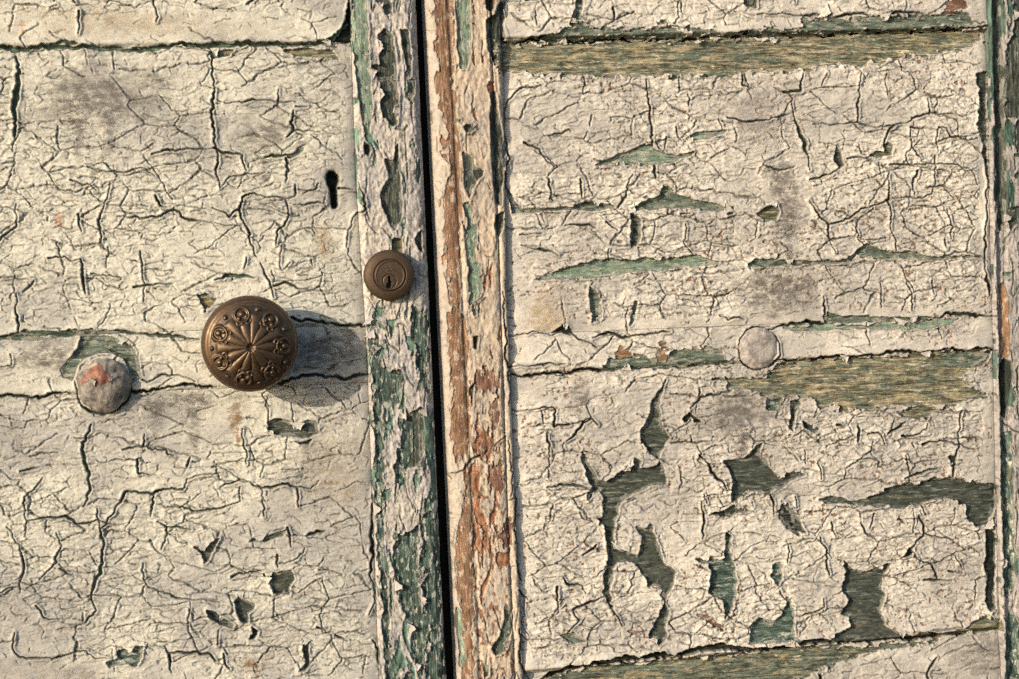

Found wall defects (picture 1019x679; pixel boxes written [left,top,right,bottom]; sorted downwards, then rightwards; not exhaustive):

crack [12,58,21,136]
peeling [486,0,1019,230]
peeling [433,0,614,493]
crack [46,515,105,620]
rust [80,357,113,386]
crack [82,347,172,498]
crack [120,483,230,527]
crack [368,499,376,592]
peeling [362,305,444,679]
peeling [581,381,676,646]
peeling [543,431,1019,679]
peeling [725,284,1012,432]